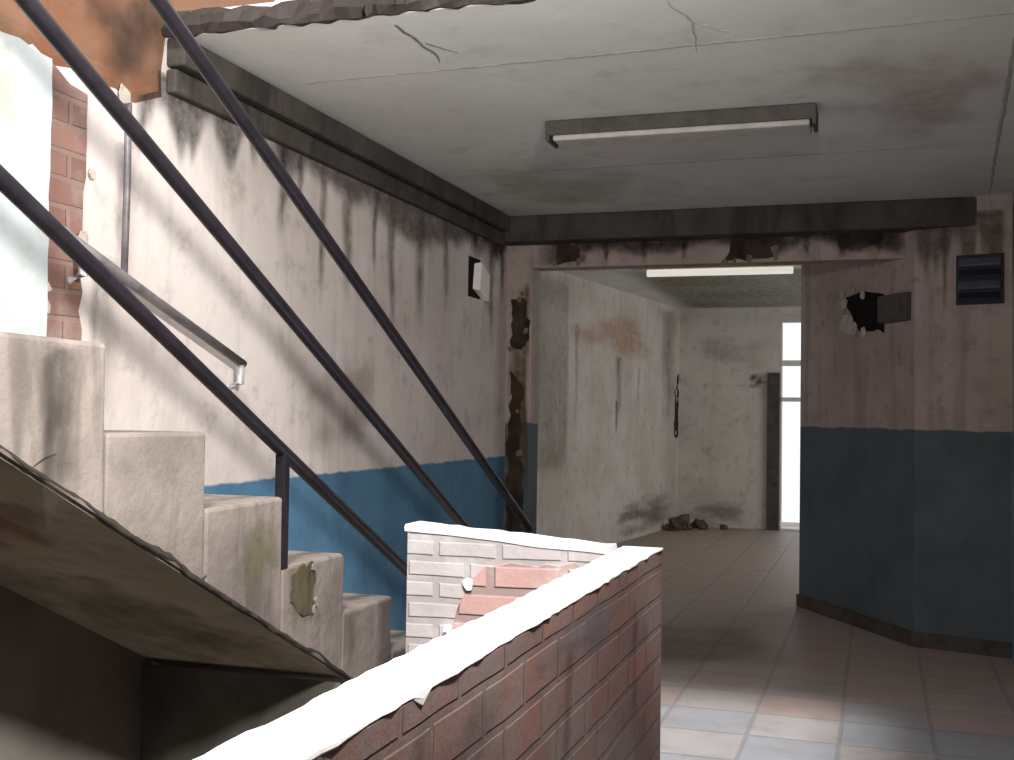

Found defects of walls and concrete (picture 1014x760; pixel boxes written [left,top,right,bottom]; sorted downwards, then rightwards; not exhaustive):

crack [395,25,458,63]
crack [668,1,729,52]
damp [276,144,503,310]
peeling [721,237,780,267]
flaking render [508,291,530,351]
spalling [839,285,884,338]
flaking render [504,371,525,533]
spalling [289,561,319,617]